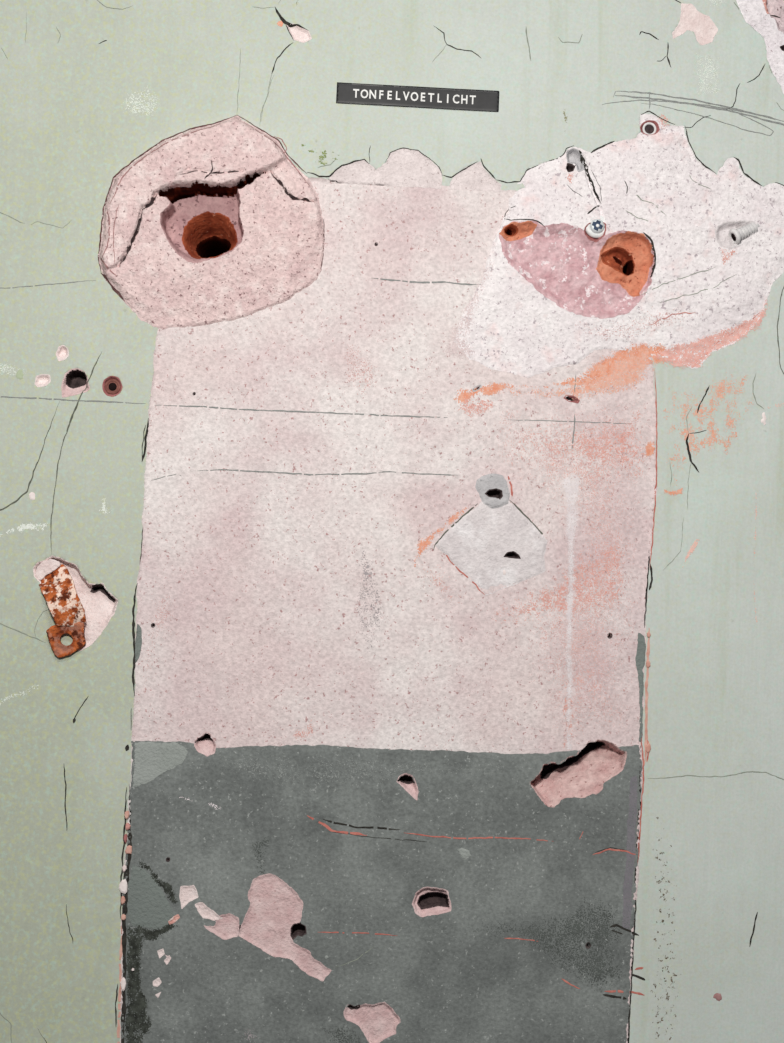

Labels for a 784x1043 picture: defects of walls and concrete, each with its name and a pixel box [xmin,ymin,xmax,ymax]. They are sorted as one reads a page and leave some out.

peeling [672,3,718,45]
spalling [736,0,784,94]
crack [98,7,735,326]
crack [641,65,784,189]
crack [0,352,102,552]
crack [666,287,784,567]
spalling [33,556,118,651]
flaking render [115,114,784,1043]
crack [647,771,784,780]